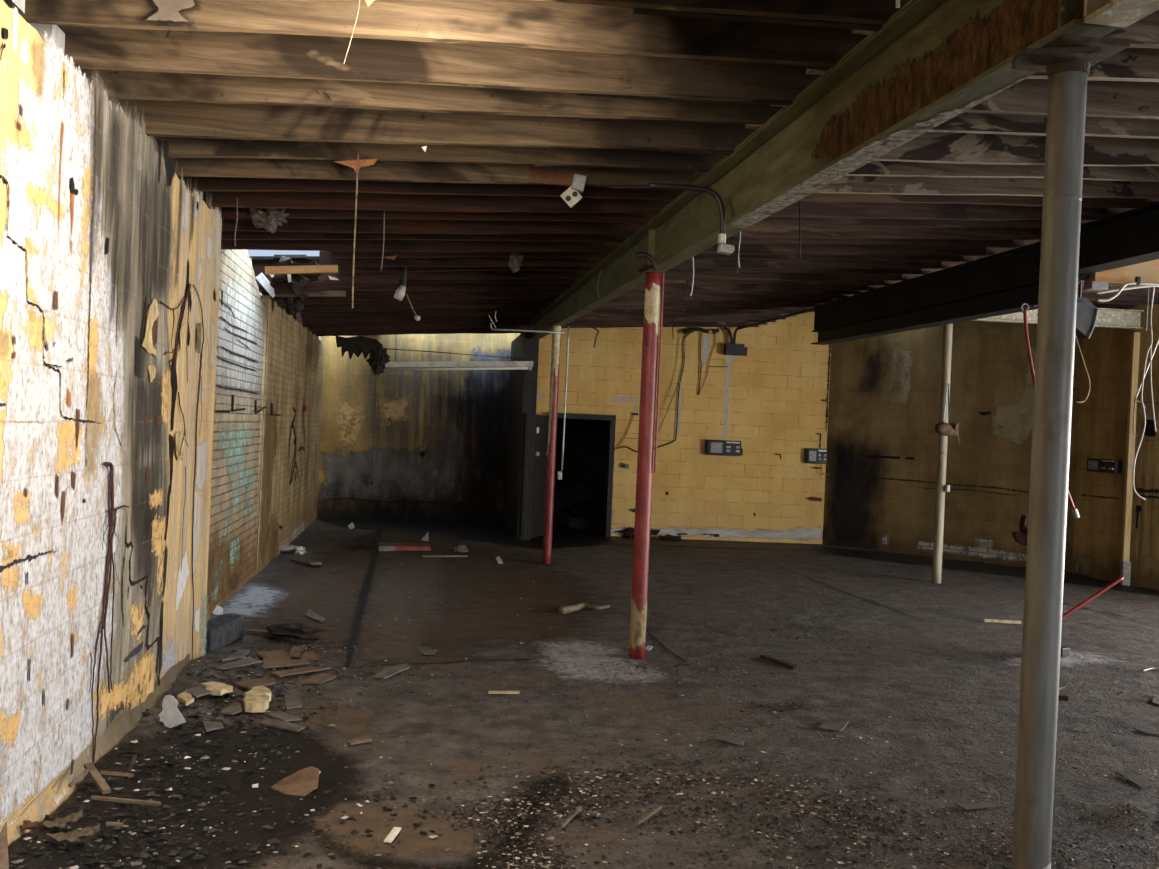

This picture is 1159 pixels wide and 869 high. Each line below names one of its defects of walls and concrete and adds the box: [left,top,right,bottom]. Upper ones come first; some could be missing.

peeling [197,207,223,305]
peeling [0,7,216,831]
crack [0,175,270,563]
damp [86,95,194,724]
damp [329,367,509,462]
crack [0,550,59,572]
peeling [195,505,240,632]